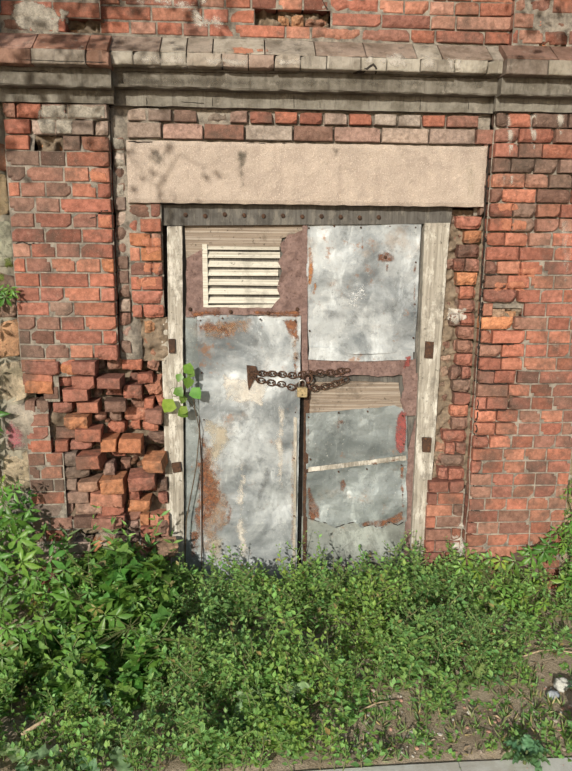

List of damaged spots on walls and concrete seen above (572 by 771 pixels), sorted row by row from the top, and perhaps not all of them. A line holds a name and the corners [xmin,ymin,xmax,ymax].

spalling [254,9,329,28]
spalling [498,203,527,231]
corrosion [192,311,246,336]
corrosion [255,311,299,343]
spalling [432,210,487,485]
corrosion [190,441,231,554]
corrosion [308,488,319,520]
corrosion [363,512,403,527]